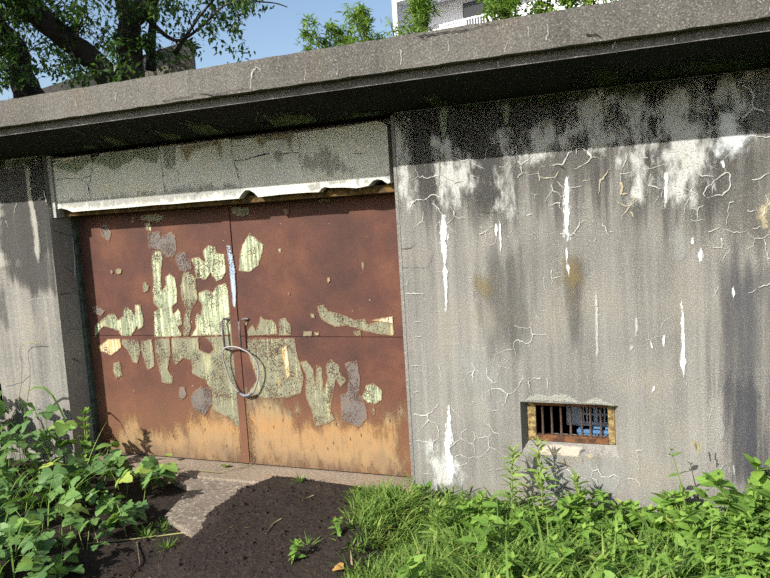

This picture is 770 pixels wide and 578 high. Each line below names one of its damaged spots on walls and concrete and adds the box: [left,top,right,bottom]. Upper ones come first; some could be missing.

crack [698,85,770,142]
water stain [0,148,157,294]
water stain [394,70,754,311]
crack [397,118,770,268]
water stain [759,201,770,228]
corrosion [107,393,406,476]
water stain [425,405,464,492]
crack [415,315,548,475]
crack [553,450,641,499]
water stain [725,267,756,476]